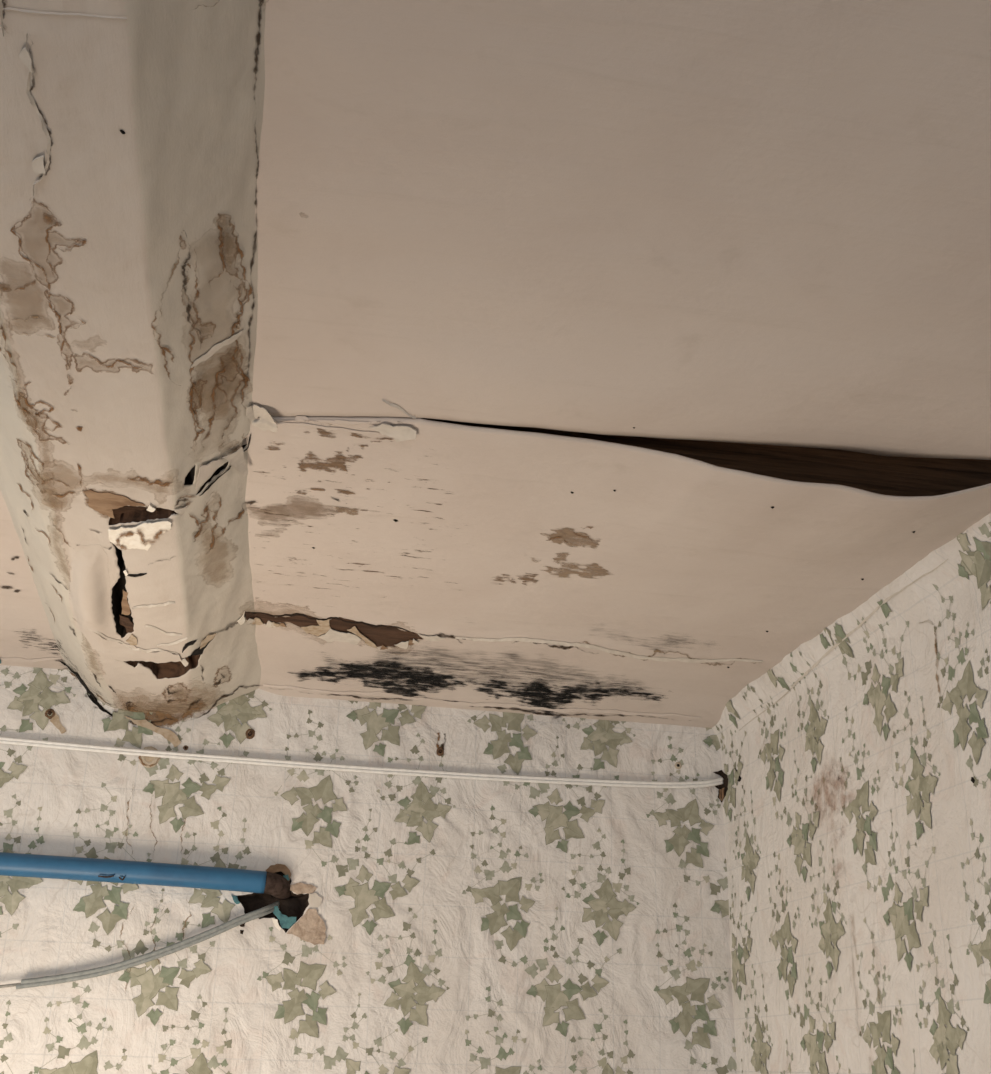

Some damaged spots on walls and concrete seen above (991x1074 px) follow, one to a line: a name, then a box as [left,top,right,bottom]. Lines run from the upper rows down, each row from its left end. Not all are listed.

crack [0,0,53,196]
crack [254,0,263,100]
crack [247,130,259,374]
peeling [246,399,417,504]
peeling [83,489,156,519]
peeling [237,611,458,650]
leakage [287,652,664,718]
spalling [232,864,326,945]